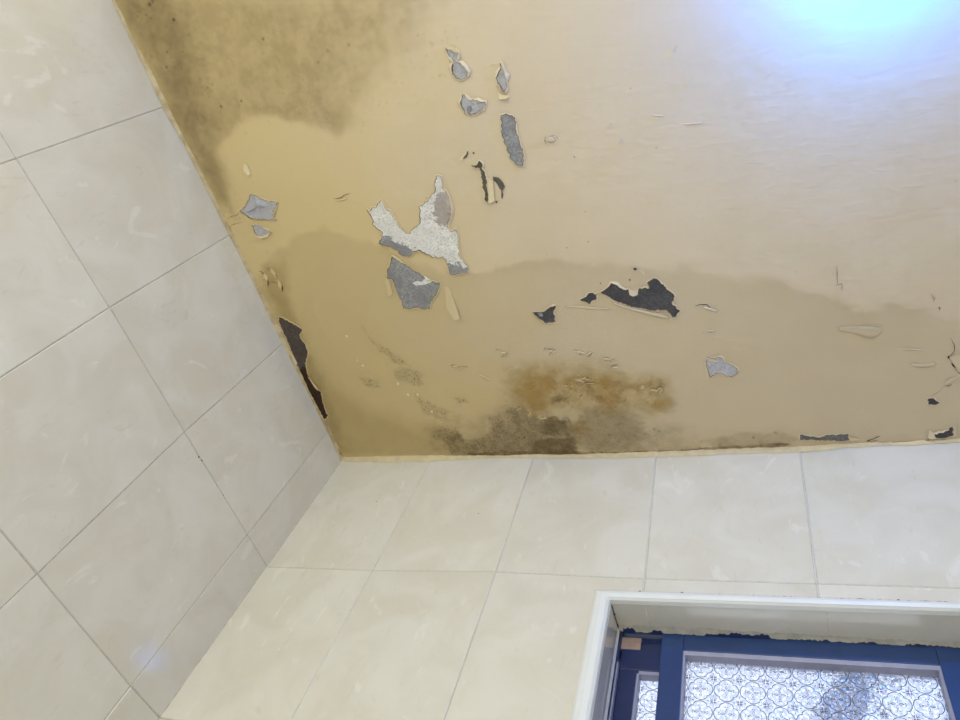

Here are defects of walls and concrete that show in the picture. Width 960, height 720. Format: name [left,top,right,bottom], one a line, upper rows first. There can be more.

peeling [445,45,471,81]
peeling [494,60,509,99]
peeling [458,93,487,116]
peeling [499,112,525,168]
peeling [459,150,505,203]
peeling [239,193,279,239]
peeling [366,174,469,321]
peeling [531,303,557,324]
peeling [579,268,681,319]
peeling [278,316,329,420]
peeling [798,433,859,442]
peeling [925,424,957,441]